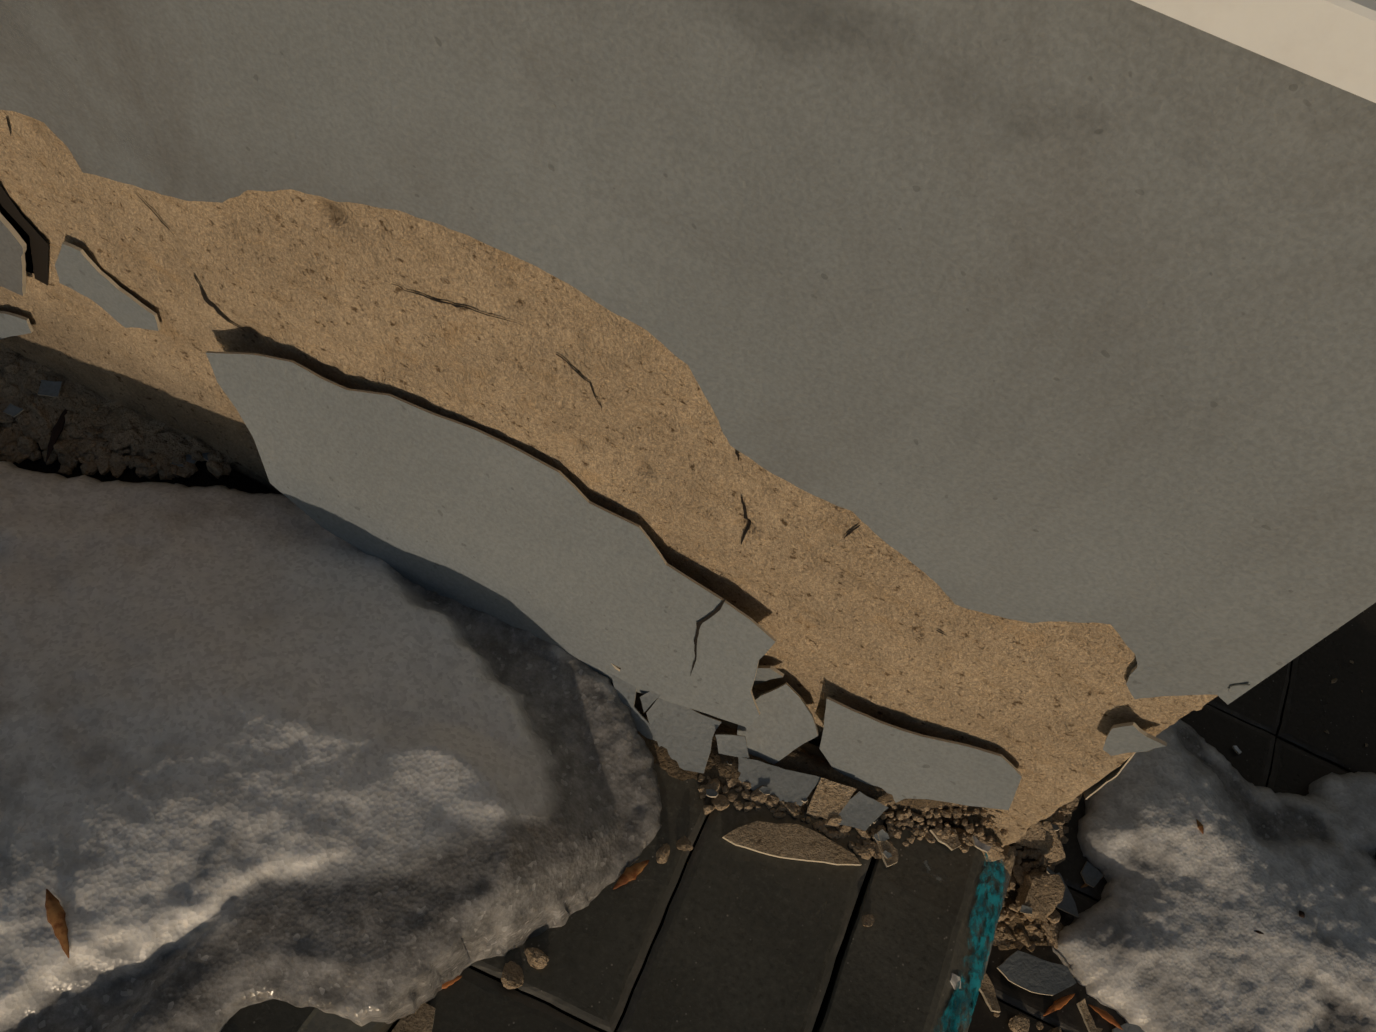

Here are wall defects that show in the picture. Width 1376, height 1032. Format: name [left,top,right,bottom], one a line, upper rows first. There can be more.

flaking render [0,110,1250,867]